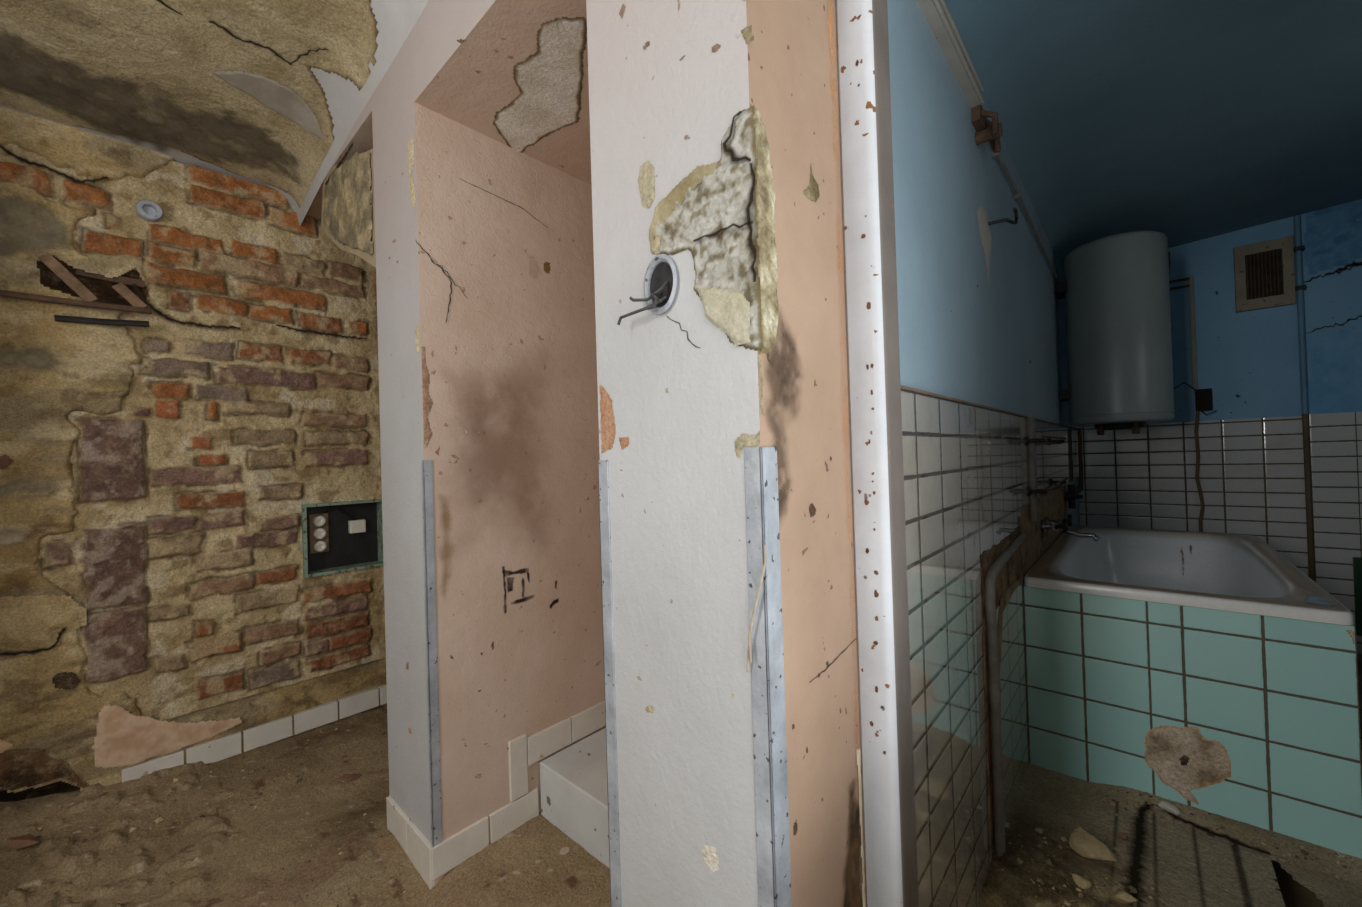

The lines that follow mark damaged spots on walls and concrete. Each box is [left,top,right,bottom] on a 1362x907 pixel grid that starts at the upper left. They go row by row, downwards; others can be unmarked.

crack [157,0,328,65]
water stain [0,36,296,180]
peeling [493,16,587,153]
crack [0,145,109,183]
spalling [638,104,779,415]
crack [1303,262,1362,283]
flaking render [0,0,386,721]
crack [1309,316,1362,333]
spalling [735,431,760,458]
spalling [1144,725,1231,805]
water stain [844,787,863,907]